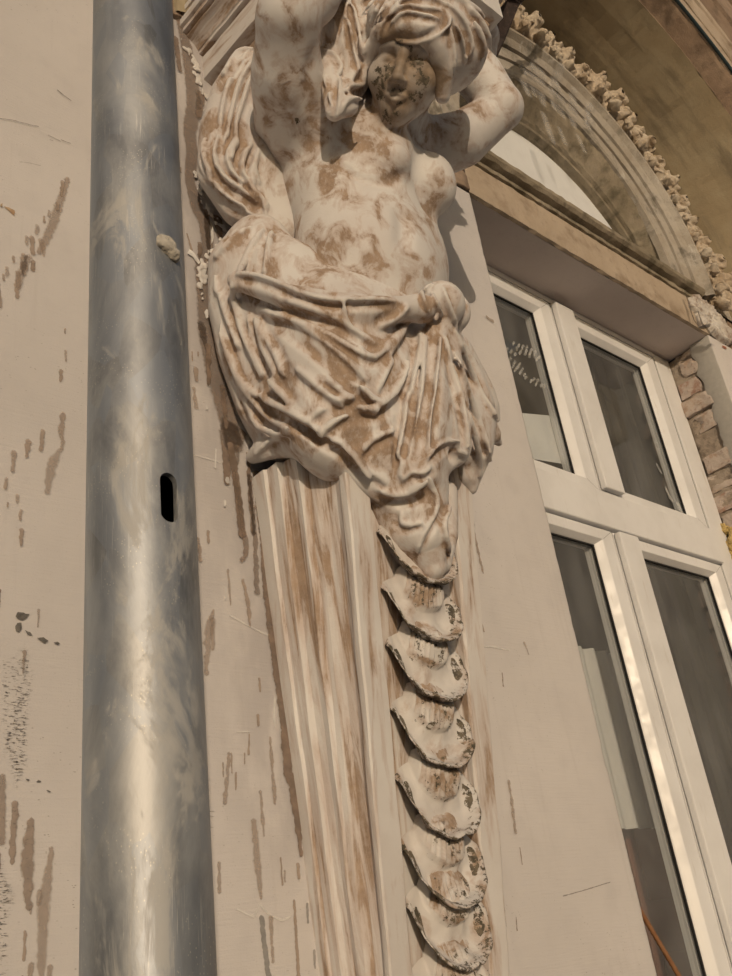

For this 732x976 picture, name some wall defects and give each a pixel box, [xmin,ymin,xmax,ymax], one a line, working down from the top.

spalling [15,612,60,645]